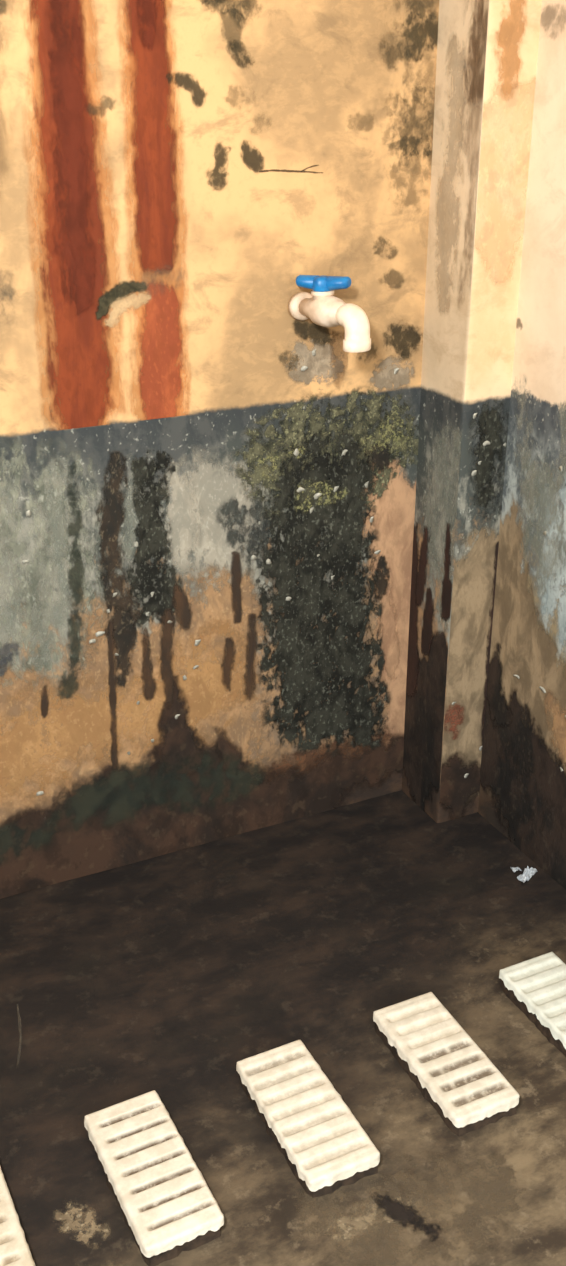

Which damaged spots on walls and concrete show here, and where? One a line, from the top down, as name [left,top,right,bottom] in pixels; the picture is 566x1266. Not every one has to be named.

rust [30,0,188,430]
damp [167,73,205,106]
damp [209,144,227,190]
damp [230,42,252,67]
damp [241,141,263,172]
damp [403,12,438,61]
damp [0,461,71,665]
damp [96,451,200,686]
damp [517,404,566,594]
damp [0,522,566,899]